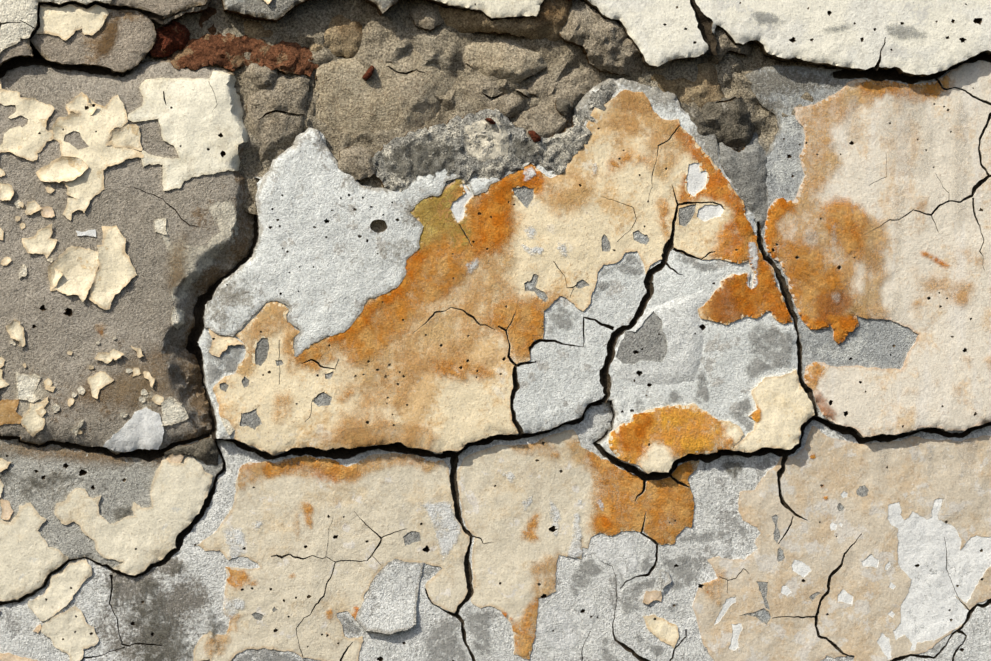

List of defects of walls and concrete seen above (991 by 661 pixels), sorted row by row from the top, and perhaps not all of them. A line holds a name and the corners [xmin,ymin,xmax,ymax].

peeling [0,80,144,310]
crack [0,1,164,78]
crack [259,69,317,120]
spalling [142,0,825,238]
rust [610,75,950,344]
crack [833,37,991,250]
peeling [0,337,219,465]
rust [237,163,592,487]
crack [0,186,991,661]
rust [570,405,734,545]
peeling [28,559,99,661]
rust [501,558,554,659]